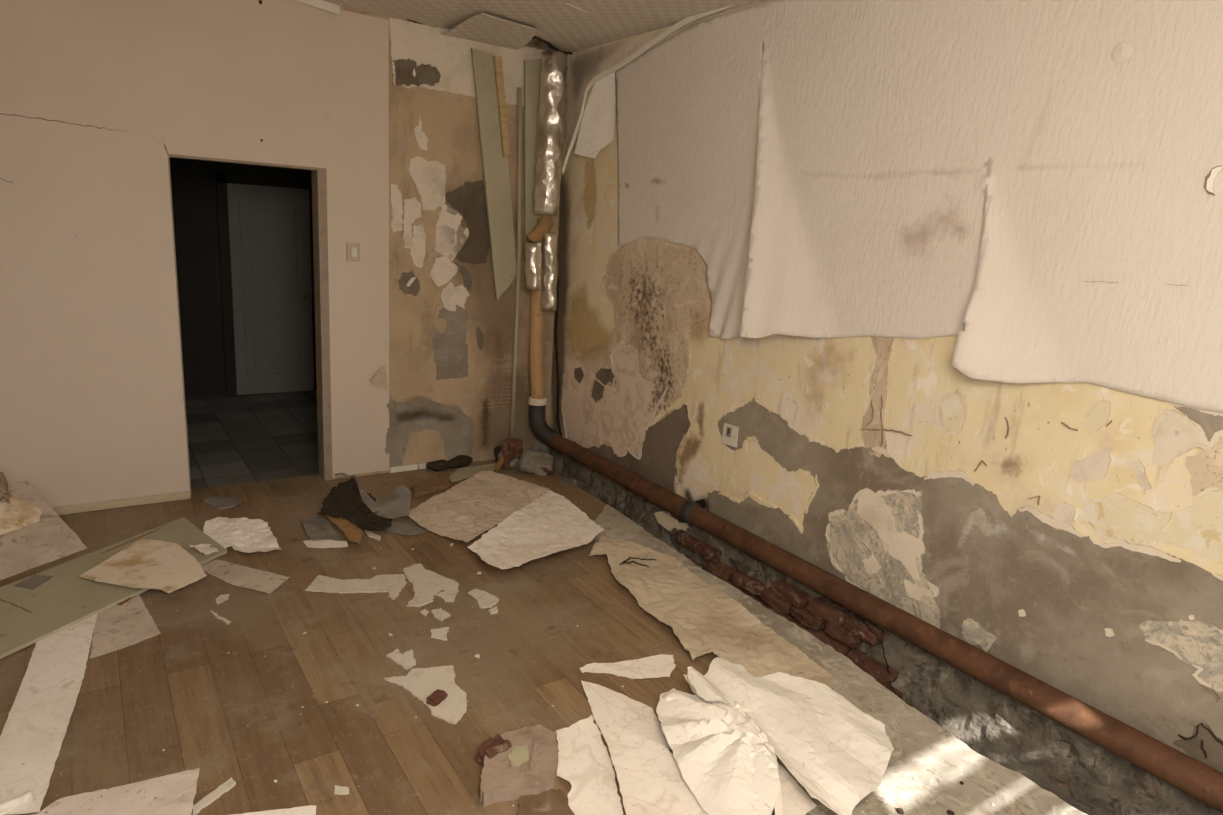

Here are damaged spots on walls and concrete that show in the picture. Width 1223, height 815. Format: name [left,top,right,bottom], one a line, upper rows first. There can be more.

crack [0,113,124,132]
peeling [389,18,547,106]
peeling [568,28,668,126]
peeling [390,116,490,380]
damp [627,279,674,410]
flaking render [385,394,475,467]
peeling [561,341,691,495]
flaking render [654,511,903,700]
flaking render [706,336,1223,773]
crack [1178,686,1223,759]